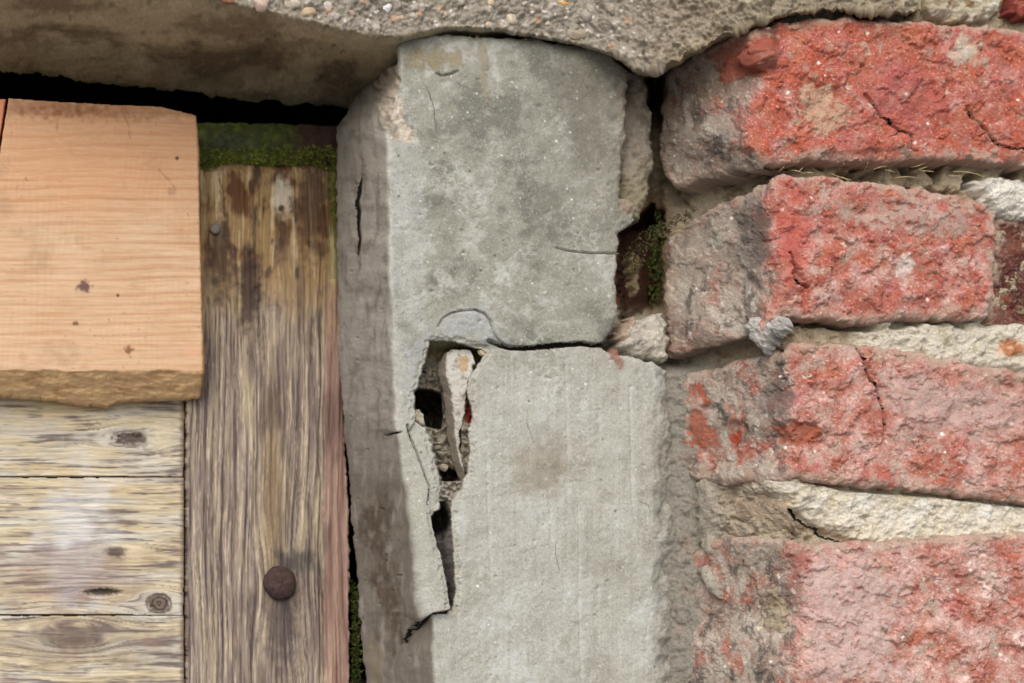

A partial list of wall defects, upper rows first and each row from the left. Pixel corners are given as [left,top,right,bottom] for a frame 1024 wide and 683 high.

crack [869,101,916,151]
crack [966,107,1024,150]
crack [354,176,362,256]
crack [557,247,619,255]
crack [438,309,607,351]
crack [856,350,886,426]
spalling [415,409,425,426]
spalling [433,350,486,498]
crack [787,508,840,542]